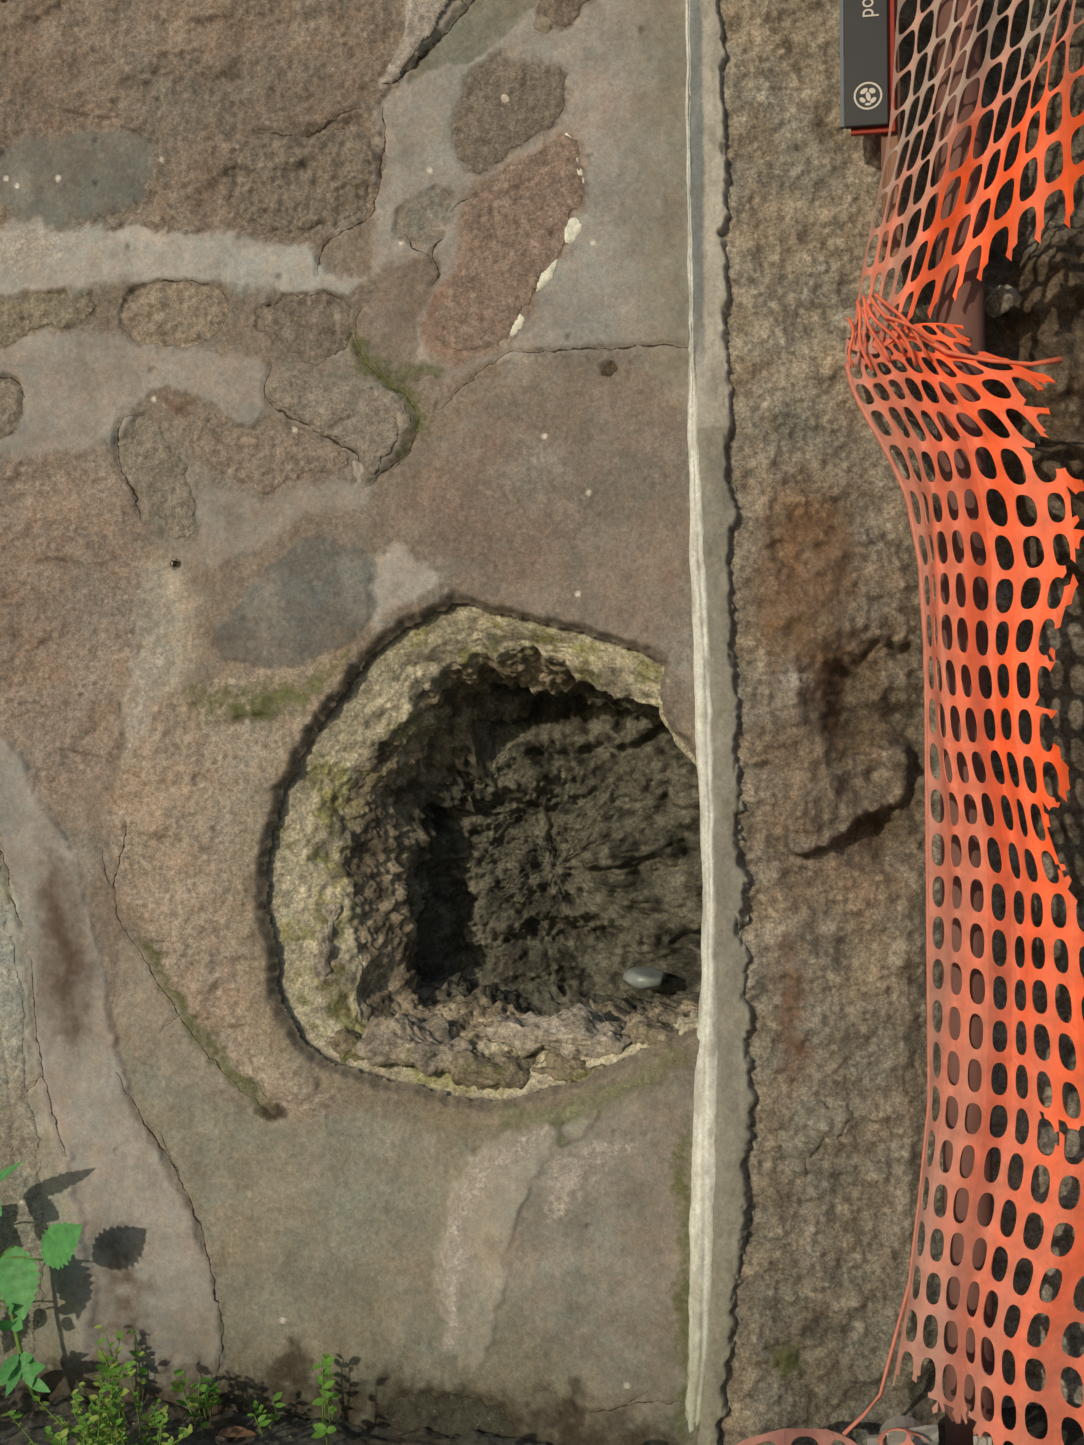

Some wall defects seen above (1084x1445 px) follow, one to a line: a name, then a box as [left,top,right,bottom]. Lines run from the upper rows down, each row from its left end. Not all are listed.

crack [116,1072,224,1395]